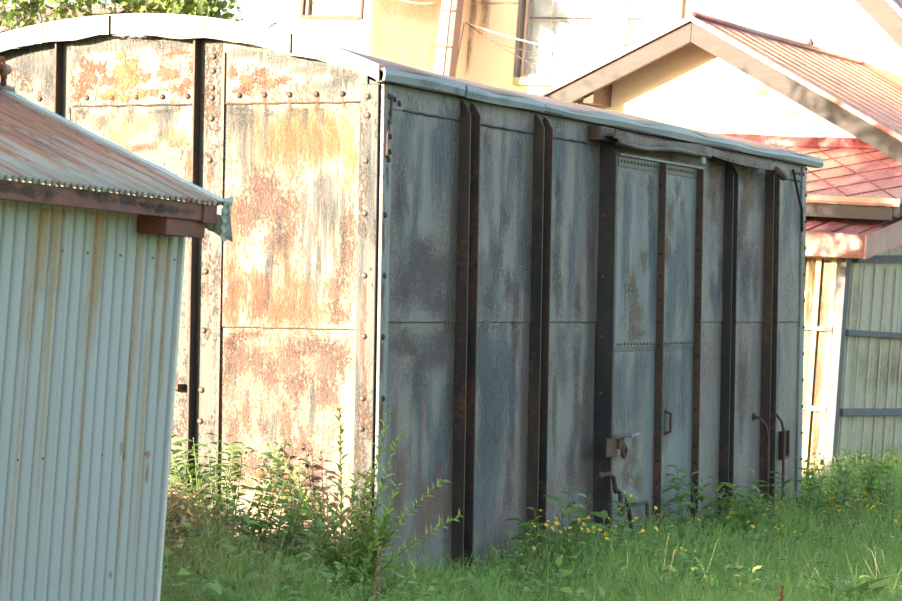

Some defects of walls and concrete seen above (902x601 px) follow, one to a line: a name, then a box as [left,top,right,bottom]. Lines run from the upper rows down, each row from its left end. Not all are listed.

corrosion [0,87,195,193]
corrosion [221,201,325,328]